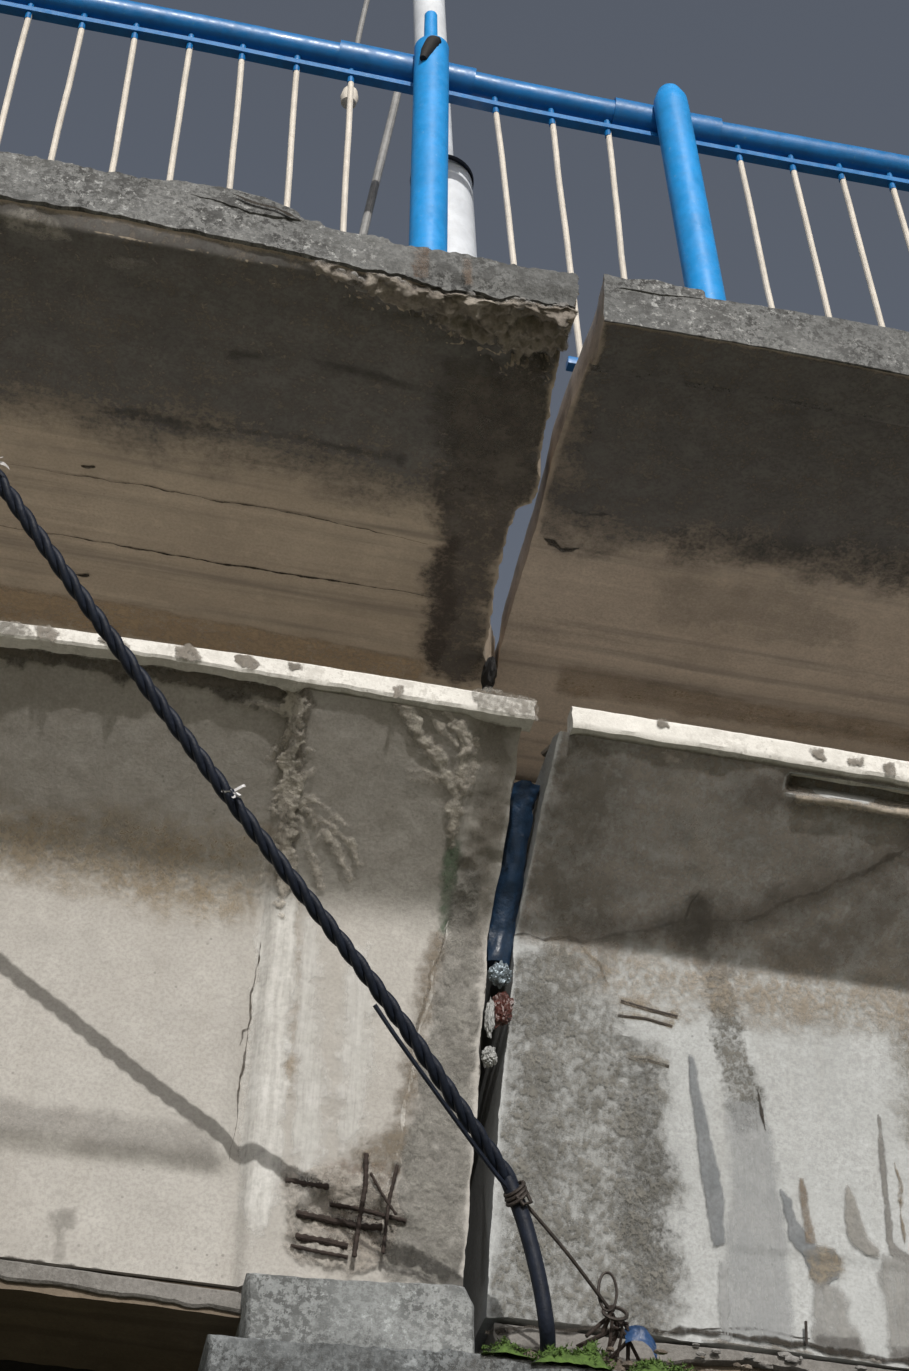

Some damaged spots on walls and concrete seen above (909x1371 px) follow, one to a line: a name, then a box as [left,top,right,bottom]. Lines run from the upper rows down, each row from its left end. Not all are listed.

spalling [311,260,578,362]
crack [12,464,425,544]
crack [57,534,440,598]
leakage [0,351,547,684]
leakage [0,689,364,1229]
crack [229,902,266,1160]
leakage [338,952,420,1175]
leakage [418,932,445,1024]
leakage [689,1055,725,1245]
crack [513,845,909,985]
leakage [780,1178,864,1351]
leakage [845,1115,909,1359]